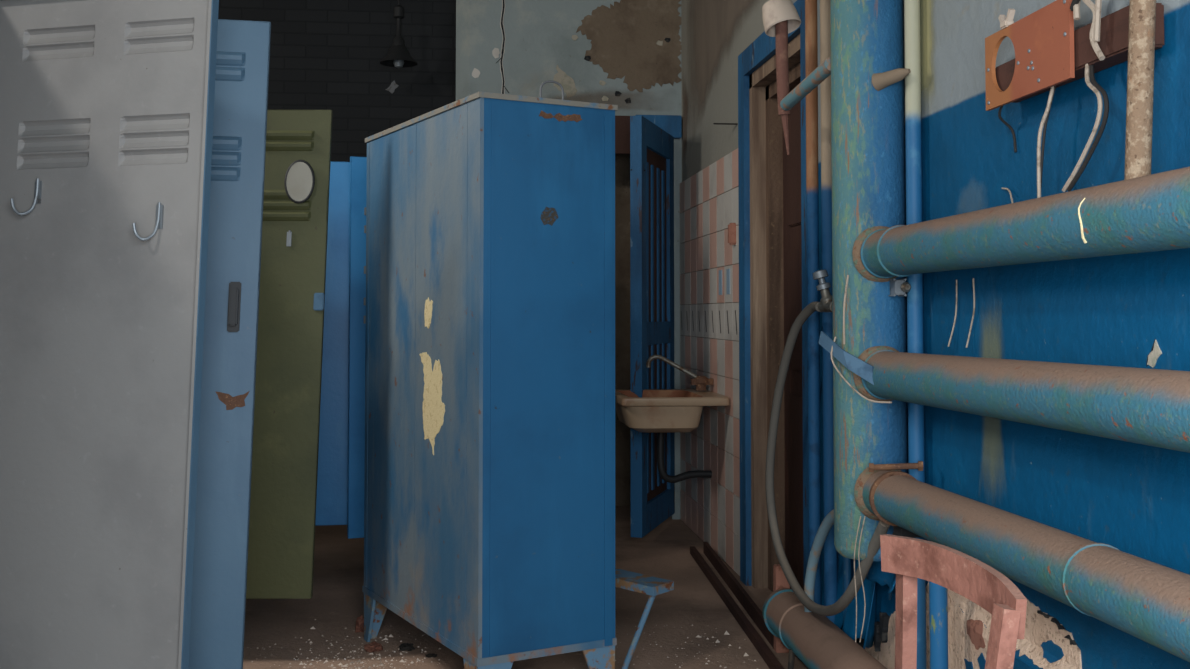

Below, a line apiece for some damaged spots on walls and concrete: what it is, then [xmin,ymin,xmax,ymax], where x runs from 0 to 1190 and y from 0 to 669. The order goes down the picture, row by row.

peeling [572,0,682,104]
peeling [1146,340,1162,368]
peeling [948,589,992,669]
peeling [1016,599,1082,669]